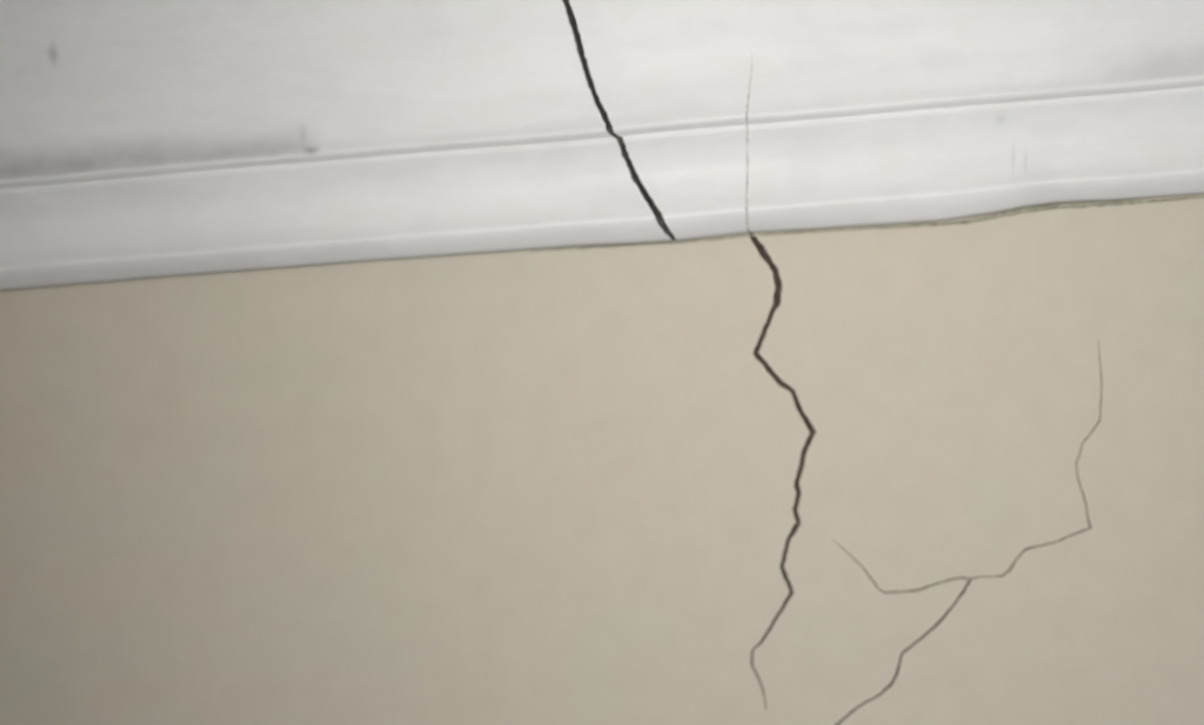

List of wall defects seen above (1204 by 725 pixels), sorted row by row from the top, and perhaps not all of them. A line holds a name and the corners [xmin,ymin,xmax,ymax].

crack [559,0,676,240]
crack [745,56,819,710]
crack [832,340,1103,725]